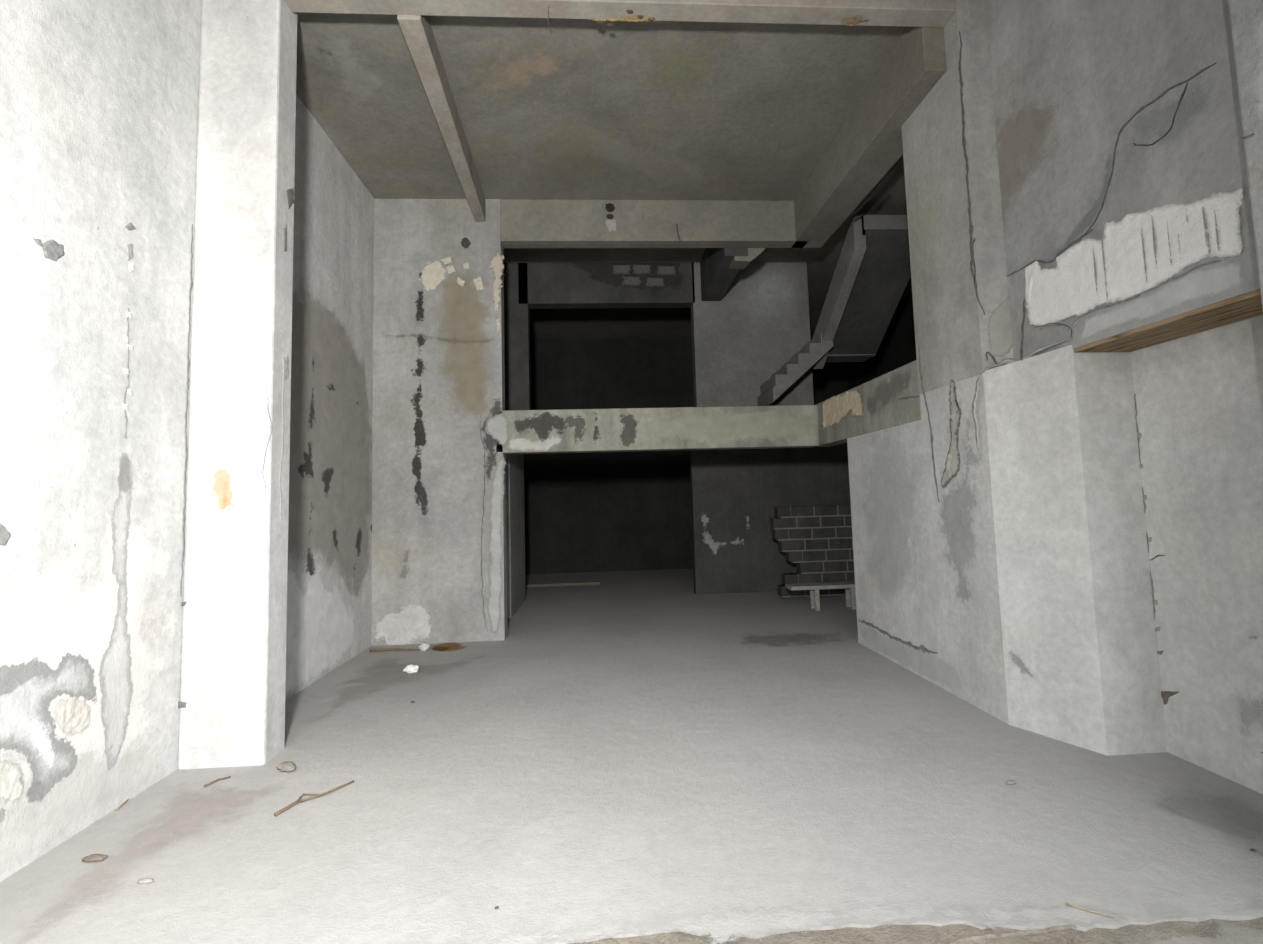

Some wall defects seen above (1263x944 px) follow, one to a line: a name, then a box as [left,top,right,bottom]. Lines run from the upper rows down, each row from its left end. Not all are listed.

peeling [419,251,505,331]
crack [958,31,1222,450]
spalling [1025,188,1244,326]
corrosion [212,468,236,515]
damp [288,280,373,604]
crack [1134,393,1165,632]
damp [0,453,158,875]
crack [858,619,938,654]